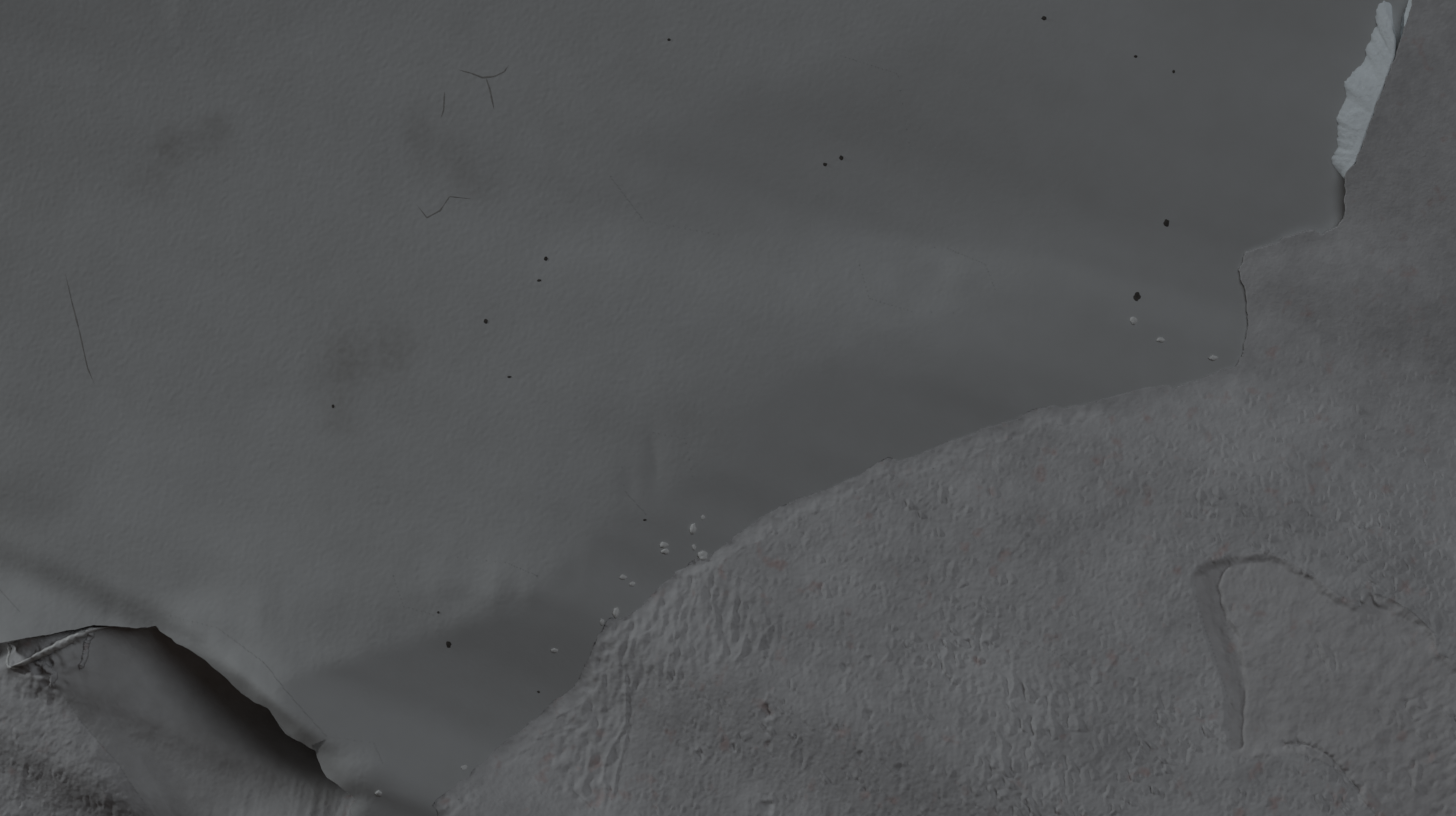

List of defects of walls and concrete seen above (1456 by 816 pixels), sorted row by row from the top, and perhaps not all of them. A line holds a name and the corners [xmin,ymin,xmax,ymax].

peeling [1400,0,1412,39]
peeling [0,591,20,643]
flaking render [54,617,349,816]